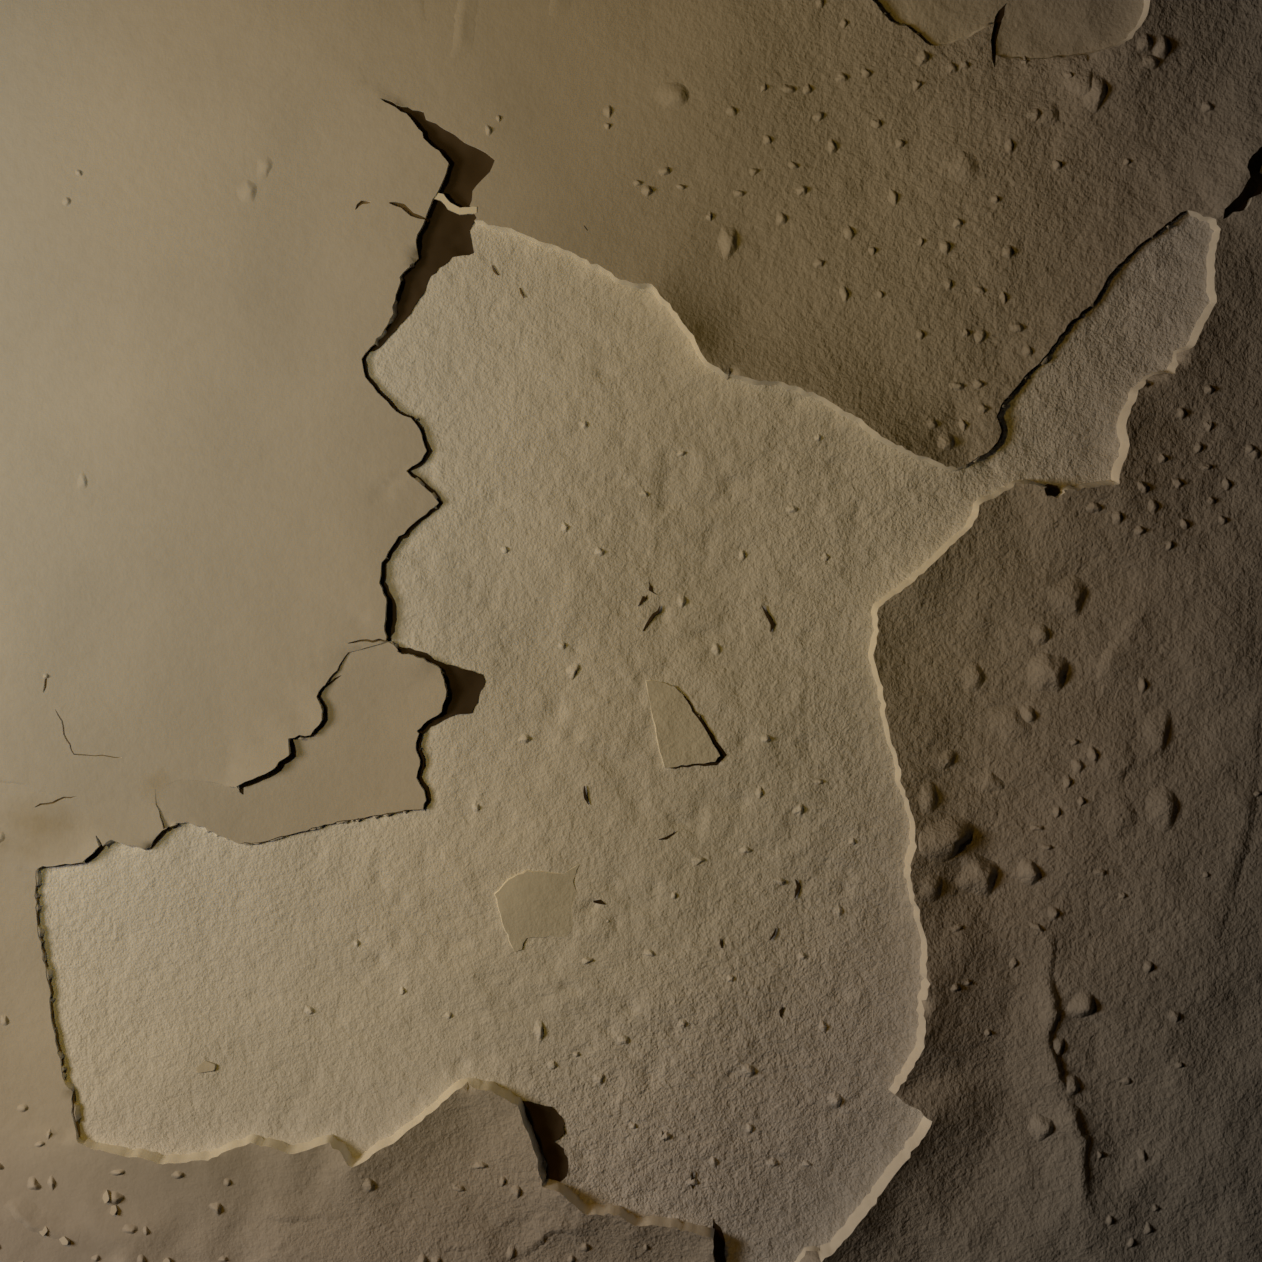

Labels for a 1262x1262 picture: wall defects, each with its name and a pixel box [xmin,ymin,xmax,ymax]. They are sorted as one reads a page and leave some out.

peeling [873,0,1144,59]
crack [1223,147,1262,219]
crack [973,211,1186,461]
crack [239,99,524,844]
peeling [38,212,1214,1262]